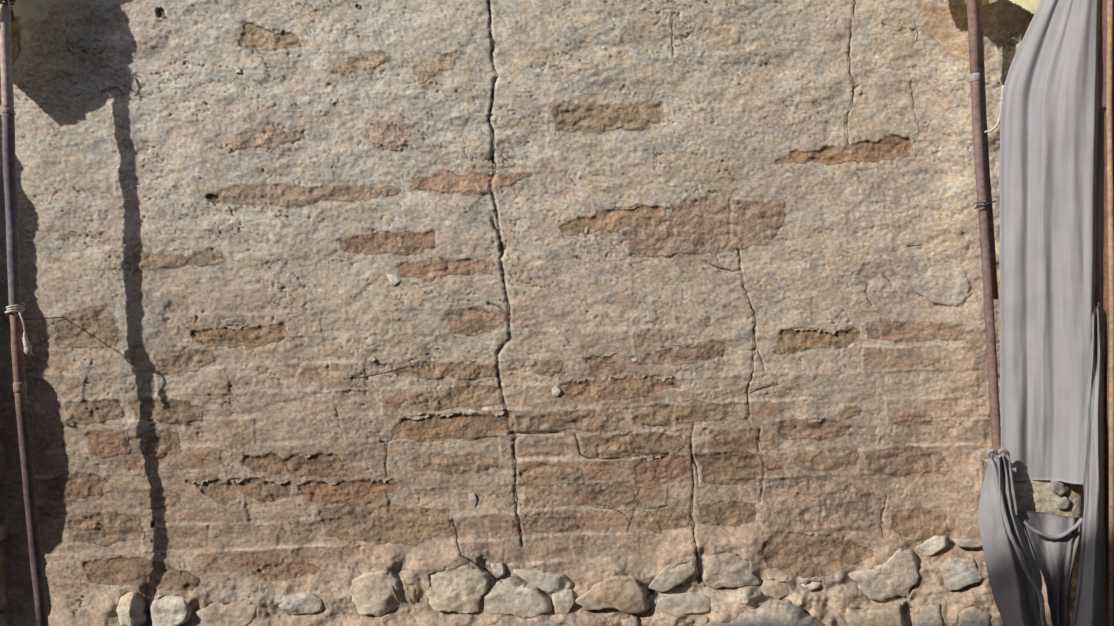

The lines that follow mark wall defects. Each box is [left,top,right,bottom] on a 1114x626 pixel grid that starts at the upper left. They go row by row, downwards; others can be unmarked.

crack [846,0,856,143]
spalling [551,101,664,133]
spalling [774,134,913,164]
spalling [210,169,532,207]
spalling [338,230,495,286]
crack [487,0,701,575]
spalling [559,199,785,258]
spalling [154,322,287,375]
crack [708,249,781,503]
spalling [773,320,967,354]
spalling [390,340,949,578]
spalling [45,453,451,591]